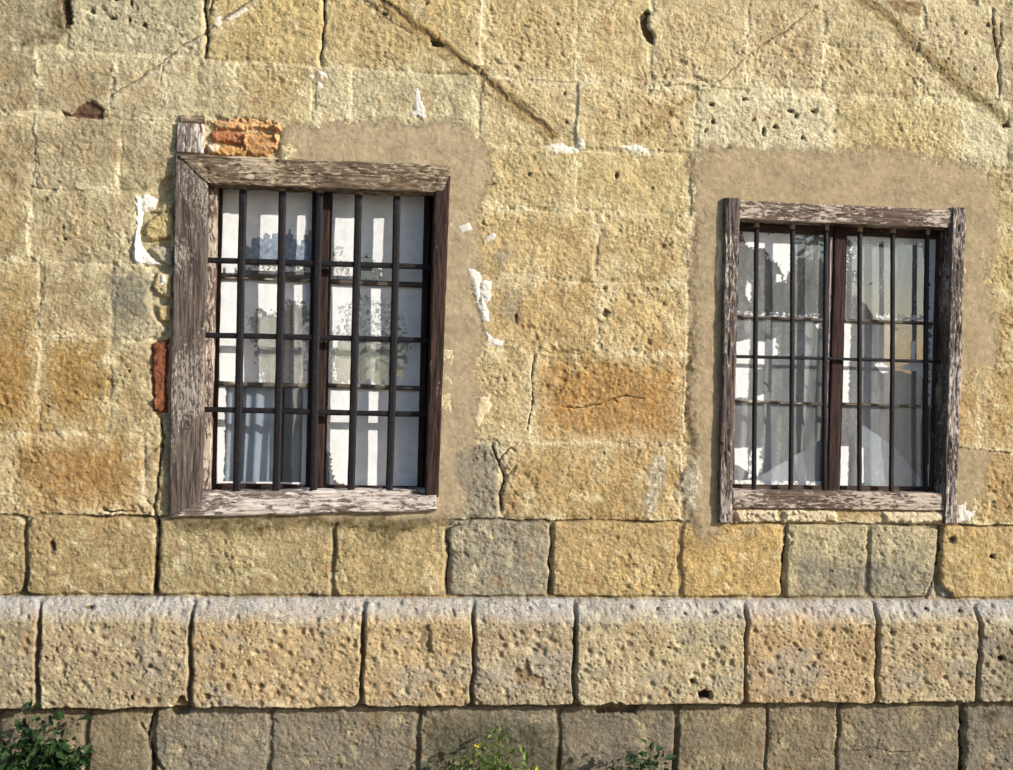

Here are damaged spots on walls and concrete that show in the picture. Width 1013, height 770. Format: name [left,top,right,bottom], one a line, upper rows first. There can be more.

flaking render [205,117,283,157]
flaking render [132,194,175,324]
peeling [468,268,505,346]
flaking render [151,338,172,414]
crack [526,360,534,429]
crack [564,395,642,409]
crack [490,446,514,508]